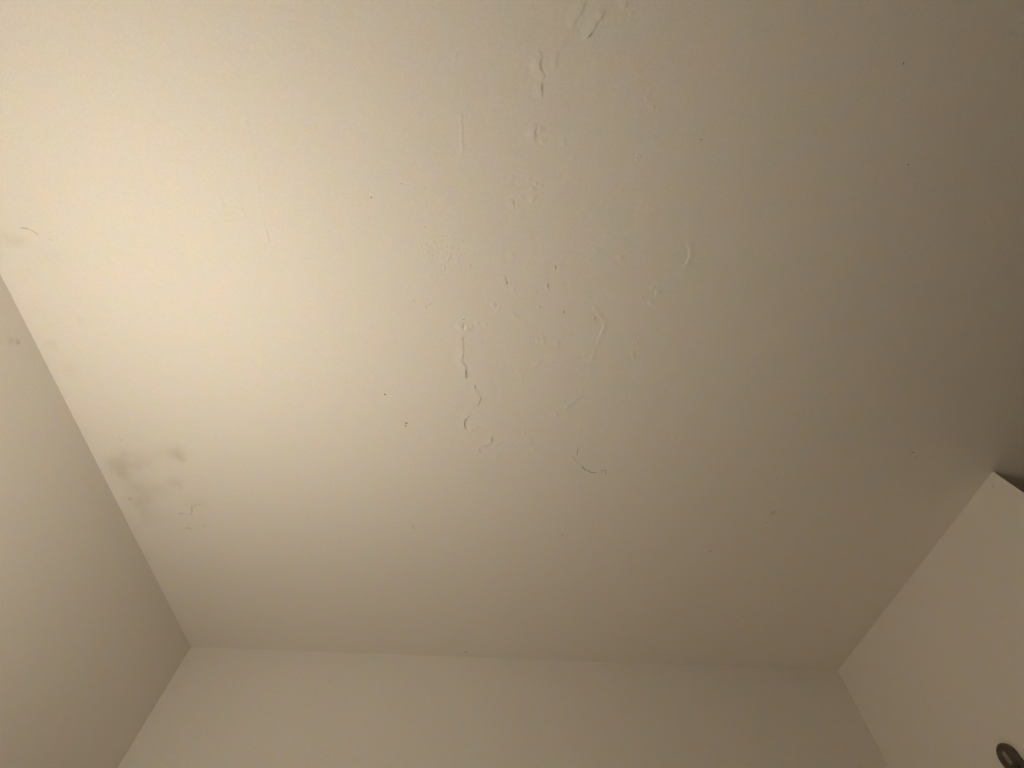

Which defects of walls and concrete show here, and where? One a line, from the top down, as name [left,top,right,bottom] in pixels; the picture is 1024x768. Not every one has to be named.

crack [454,334,494,459]